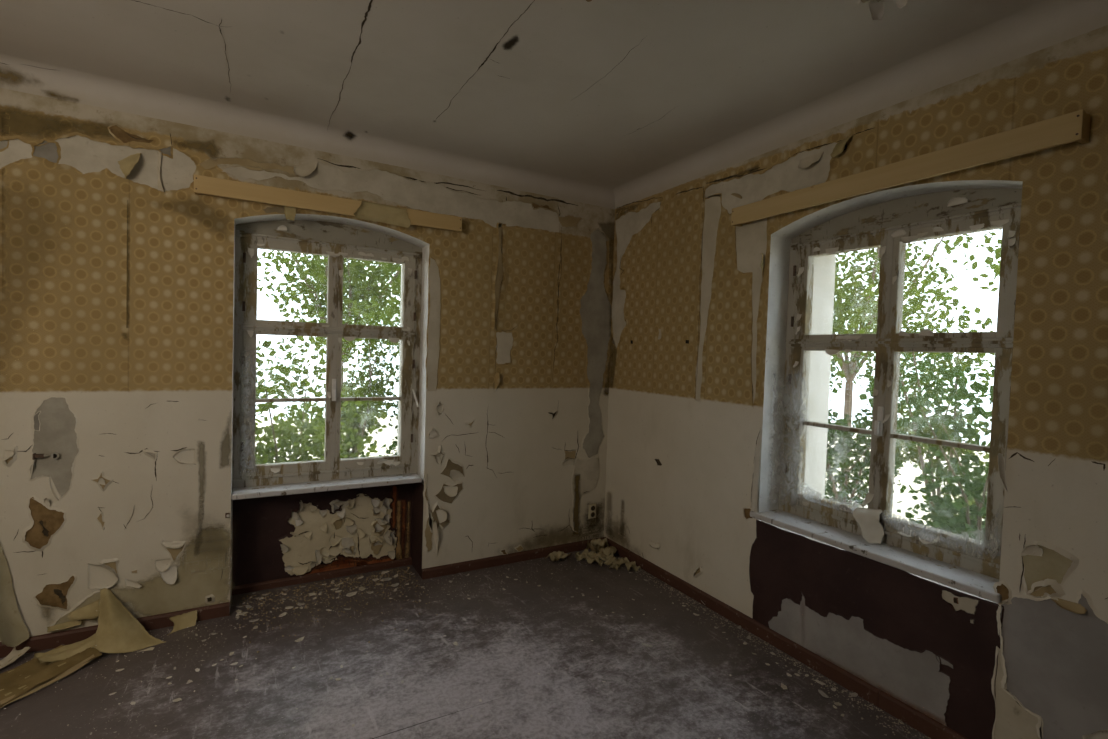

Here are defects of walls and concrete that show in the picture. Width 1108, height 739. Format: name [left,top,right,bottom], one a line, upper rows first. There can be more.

crack [133,0,231,91]
crack [328,0,373,126]
crack [436,0,535,119]
peeling [0,123,560,234]
peeling [704,140,844,216]
peeling [1,396,80,551]
crack [445,410,507,476]
peeling [33,527,231,616]
peeling [277,491,398,576]
spalling [941,588,980,624]
peeling [993,534,1108,739]